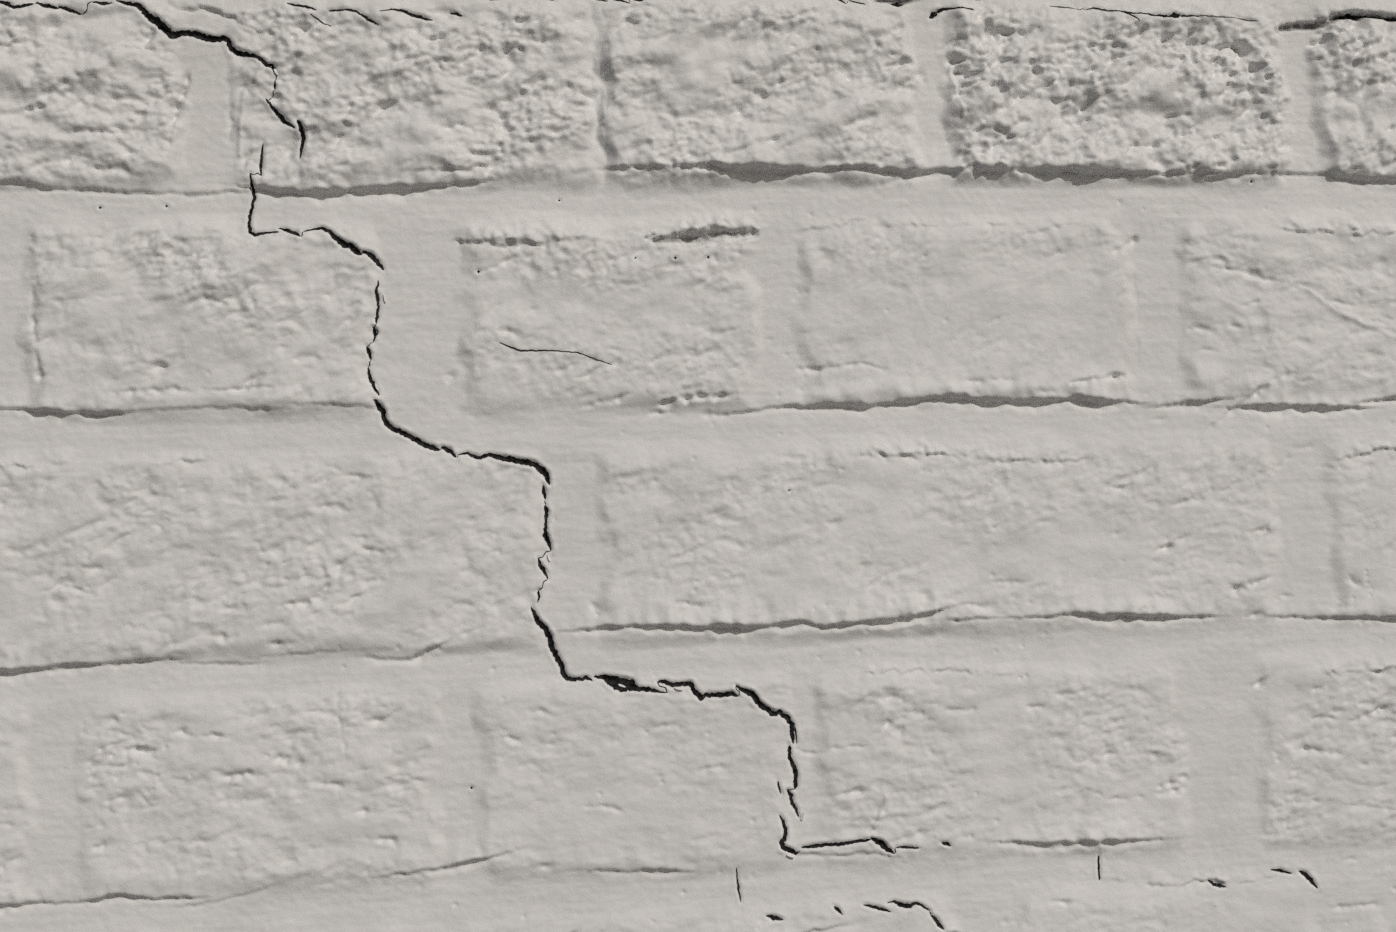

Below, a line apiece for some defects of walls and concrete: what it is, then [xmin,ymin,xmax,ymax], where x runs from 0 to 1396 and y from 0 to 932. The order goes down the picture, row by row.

crack [929,7,974,19]
crack [1053,6,1258,21]
crack [0,0,951,858]
crack [1270,869,1318,888]
crack [736,867,784,921]